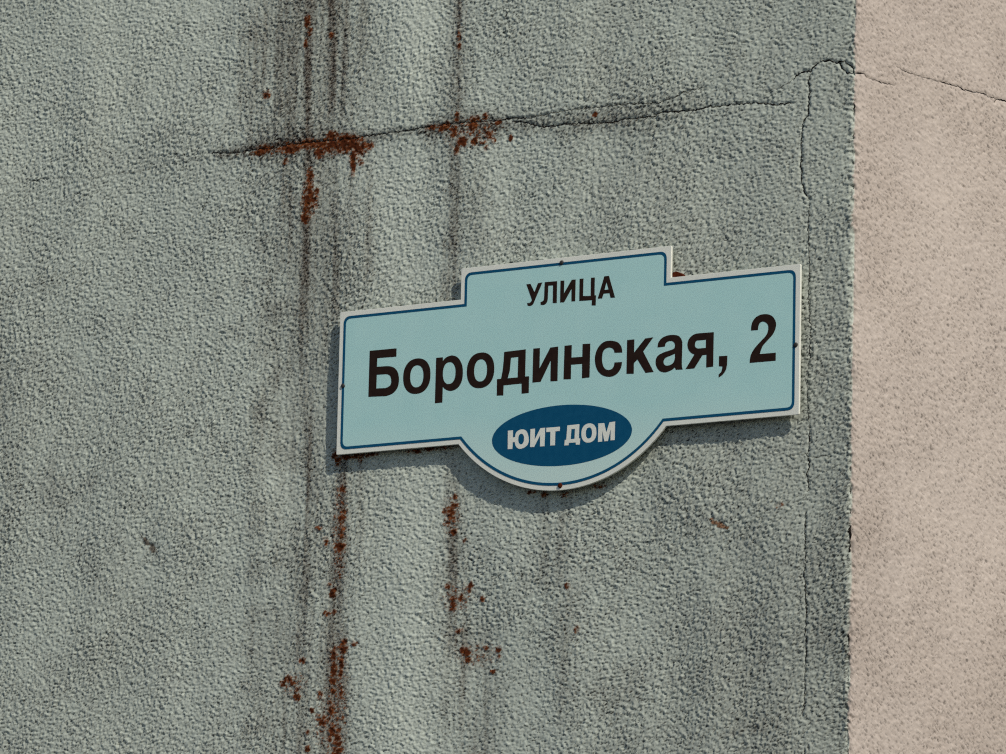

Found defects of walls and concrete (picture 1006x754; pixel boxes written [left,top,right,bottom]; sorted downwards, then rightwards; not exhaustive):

damp [216,0,387,184]
rust [300,171,319,224]
rust [254,131,374,175]
rust [425,111,502,154]
damp [410,107,554,139]
damp [299,206,310,335]
crack [211,59,1005,715]
rust [315,487,347,597]
damp [327,455,347,736]
rust [442,493,467,542]
rust [279,657,306,701]
rust [305,638,358,754]